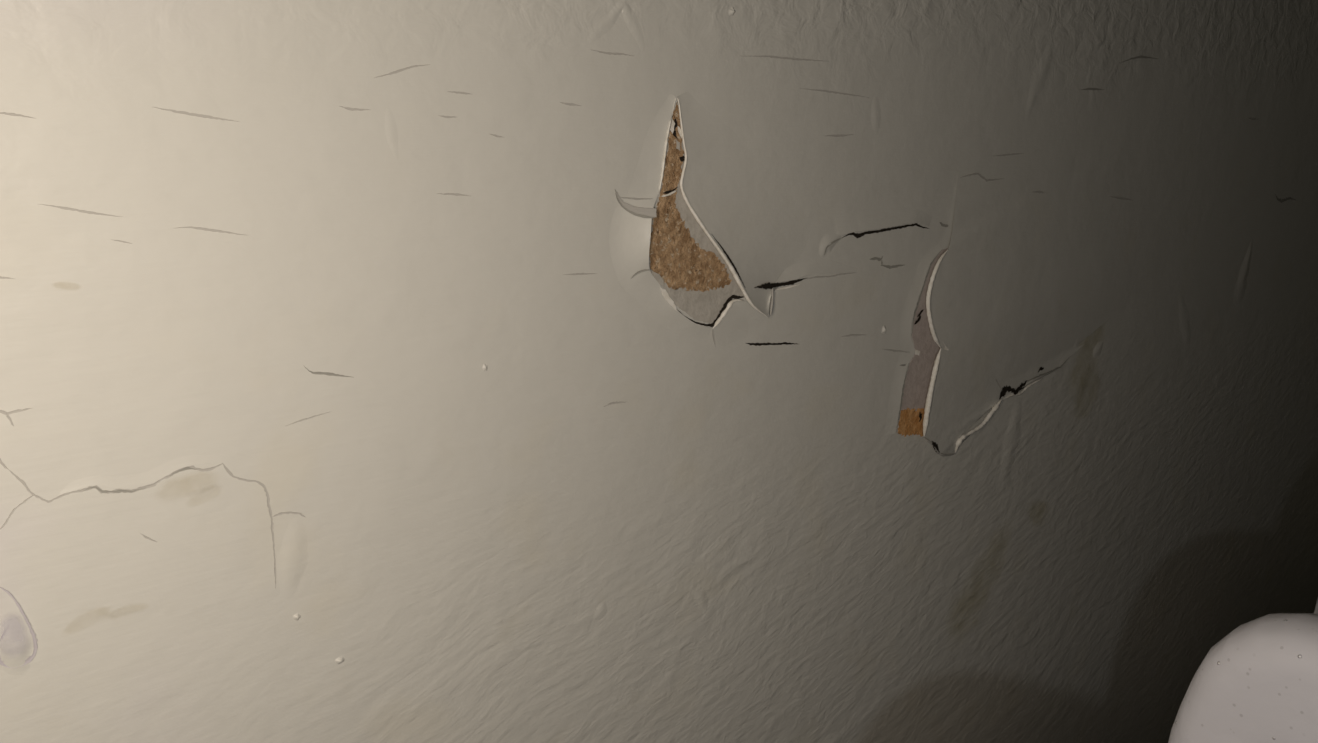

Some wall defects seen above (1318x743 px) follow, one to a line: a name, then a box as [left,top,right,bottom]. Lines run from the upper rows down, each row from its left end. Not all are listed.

peeling [609,92,810,348]
crack [755,207,948,290]
peeling [885,166,1175,456]
crack [0,408,31,426]
crack [0,455,305,588]